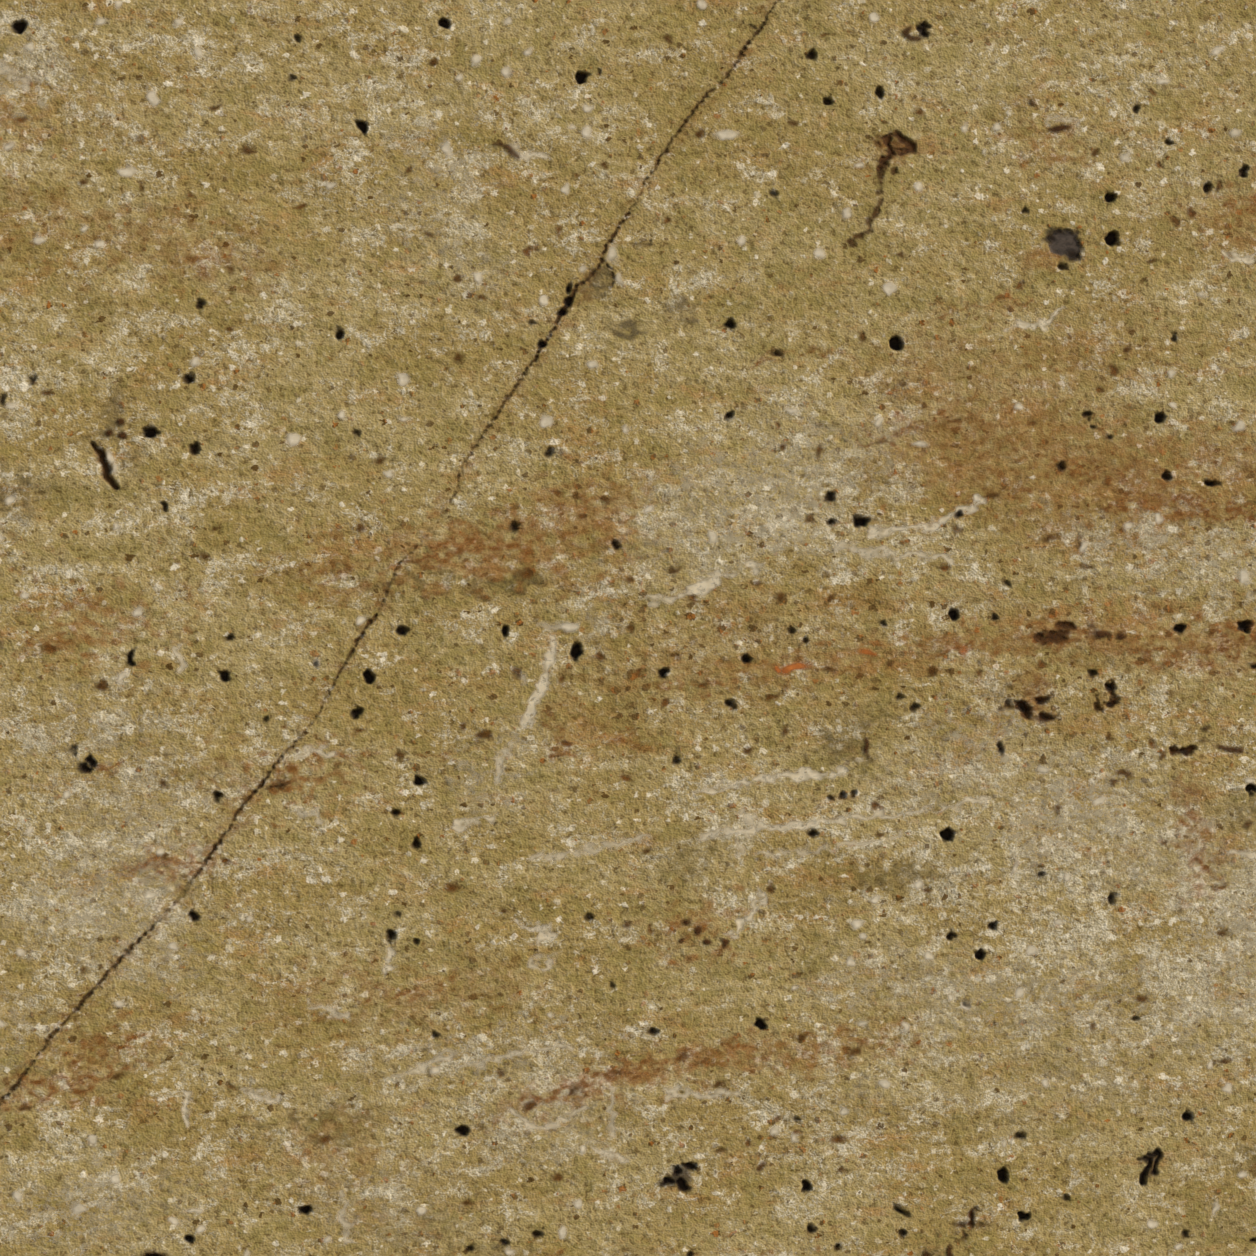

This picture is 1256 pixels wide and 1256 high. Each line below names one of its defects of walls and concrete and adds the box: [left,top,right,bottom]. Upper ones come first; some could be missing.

crack [450,3,776,500]
crack [193,562,400,879]
crack [0,925,153,1101]